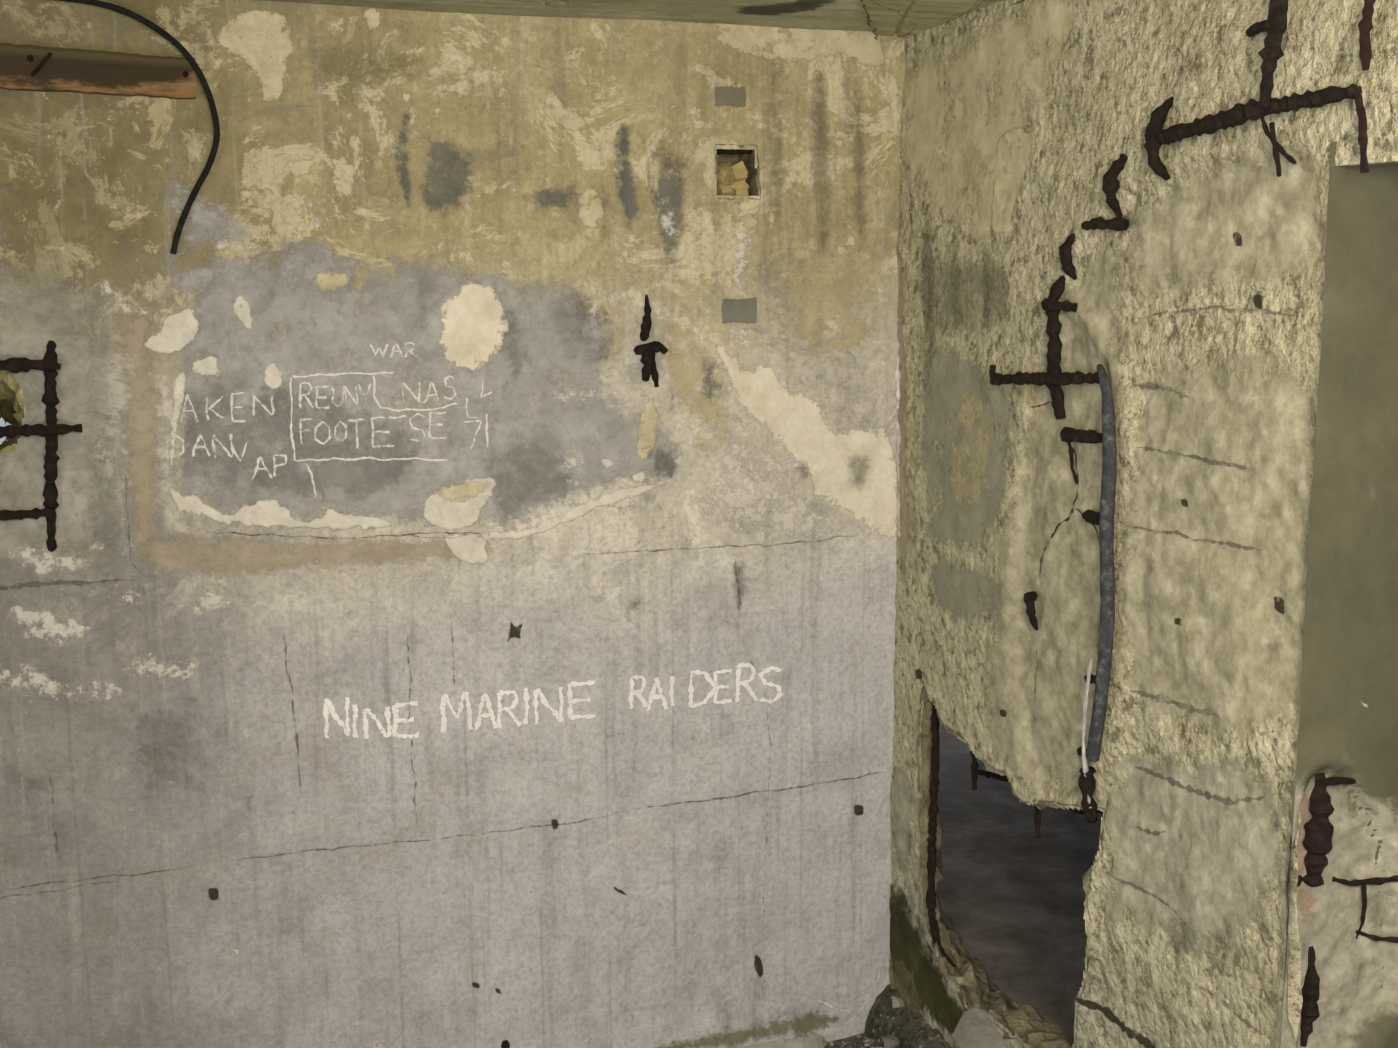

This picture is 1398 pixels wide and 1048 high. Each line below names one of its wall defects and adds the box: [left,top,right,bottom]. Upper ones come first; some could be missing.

peeling [217,9,295,101]
flaking render [711,0,1074,245]
spalling [0,268,105,575]
peeling [144,306,199,353]
peeling [169,356,221,467]
peeling [264,363,283,389]
peeling [348,282,668,585]
flaking render [716,217,909,585]
peeling [169,487,392,530]
spalling [916,0,1398,1048]
spalling [754,955,763,977]
crack [1074,995,1155,1048]